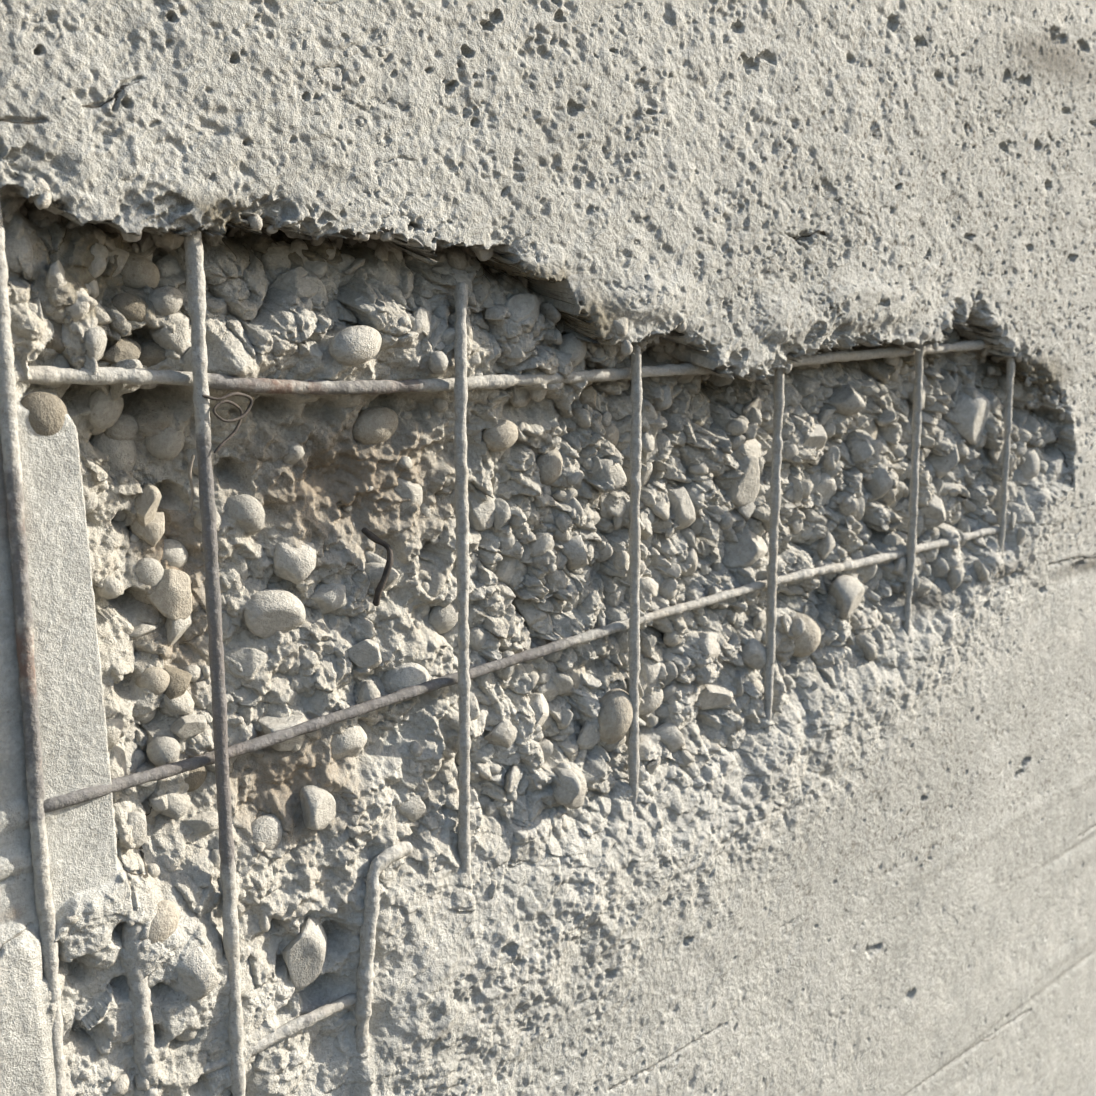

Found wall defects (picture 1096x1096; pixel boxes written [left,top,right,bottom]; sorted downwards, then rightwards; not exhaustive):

spalling [33,43,47,56]
hole [460,44,476,58]
hole [480,8,504,32]
hole [730,17,746,35]
hole [737,47,787,78]
hole [883,12,906,33]
hole [1042,22,1093,53]
hole [424,66,459,94]
hole [1001,65,1036,89]
hole [567,98,586,118]
spalling [0,177,233,1096]
spalling [198,213,1076,1096]